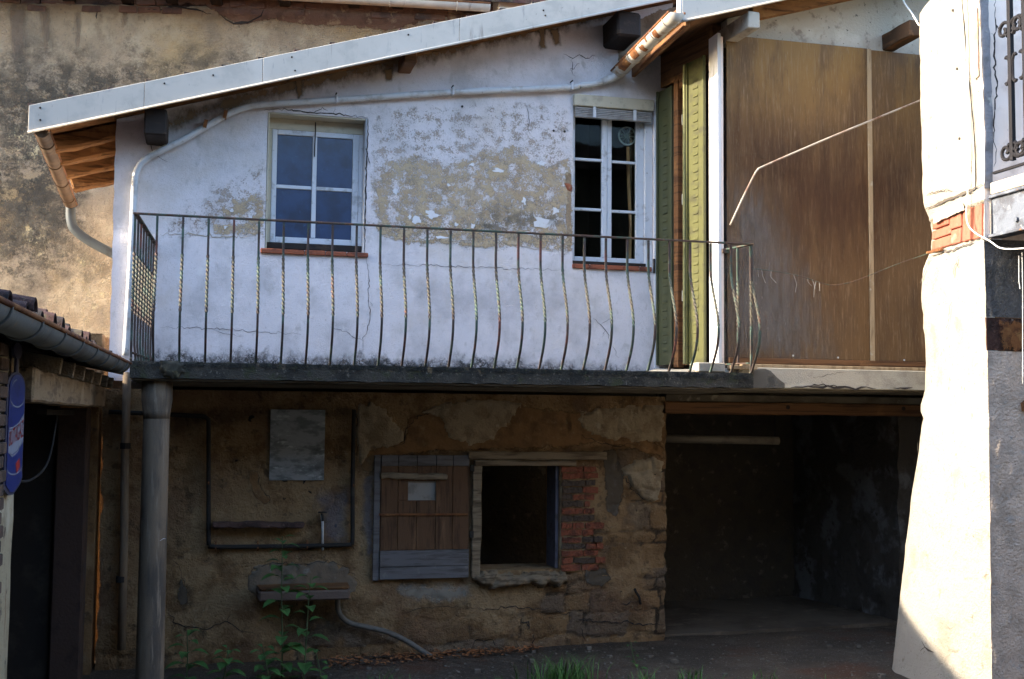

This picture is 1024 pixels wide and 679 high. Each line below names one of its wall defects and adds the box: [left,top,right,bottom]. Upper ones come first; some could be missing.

peeling [173,169,265,235]
peeling [372,105,573,251]
flaking render [926,184,982,223]